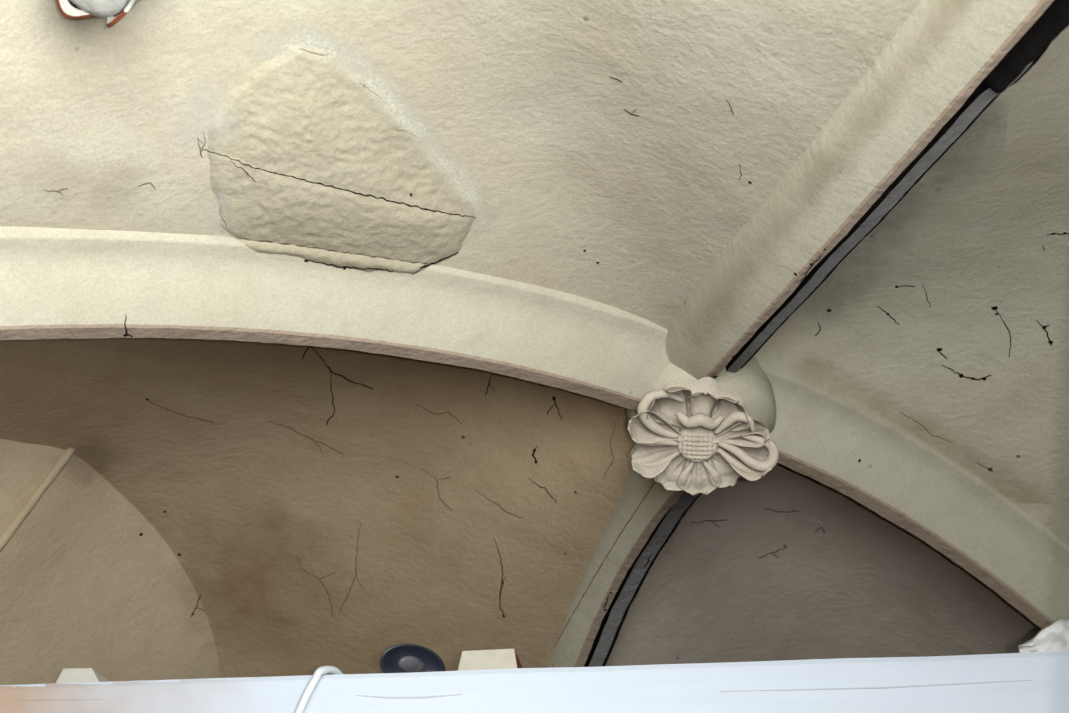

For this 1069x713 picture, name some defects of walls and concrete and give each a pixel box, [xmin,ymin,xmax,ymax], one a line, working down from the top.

crack [877,283,931,324]
crack [936,306,1011,381]
crack [1037,320,1053,346]
crack [266,346,373,454]
crack [529,446,557,503]
crack [296,522,363,618]
crack [494,539,506,618]
crack [554,481,655,647]